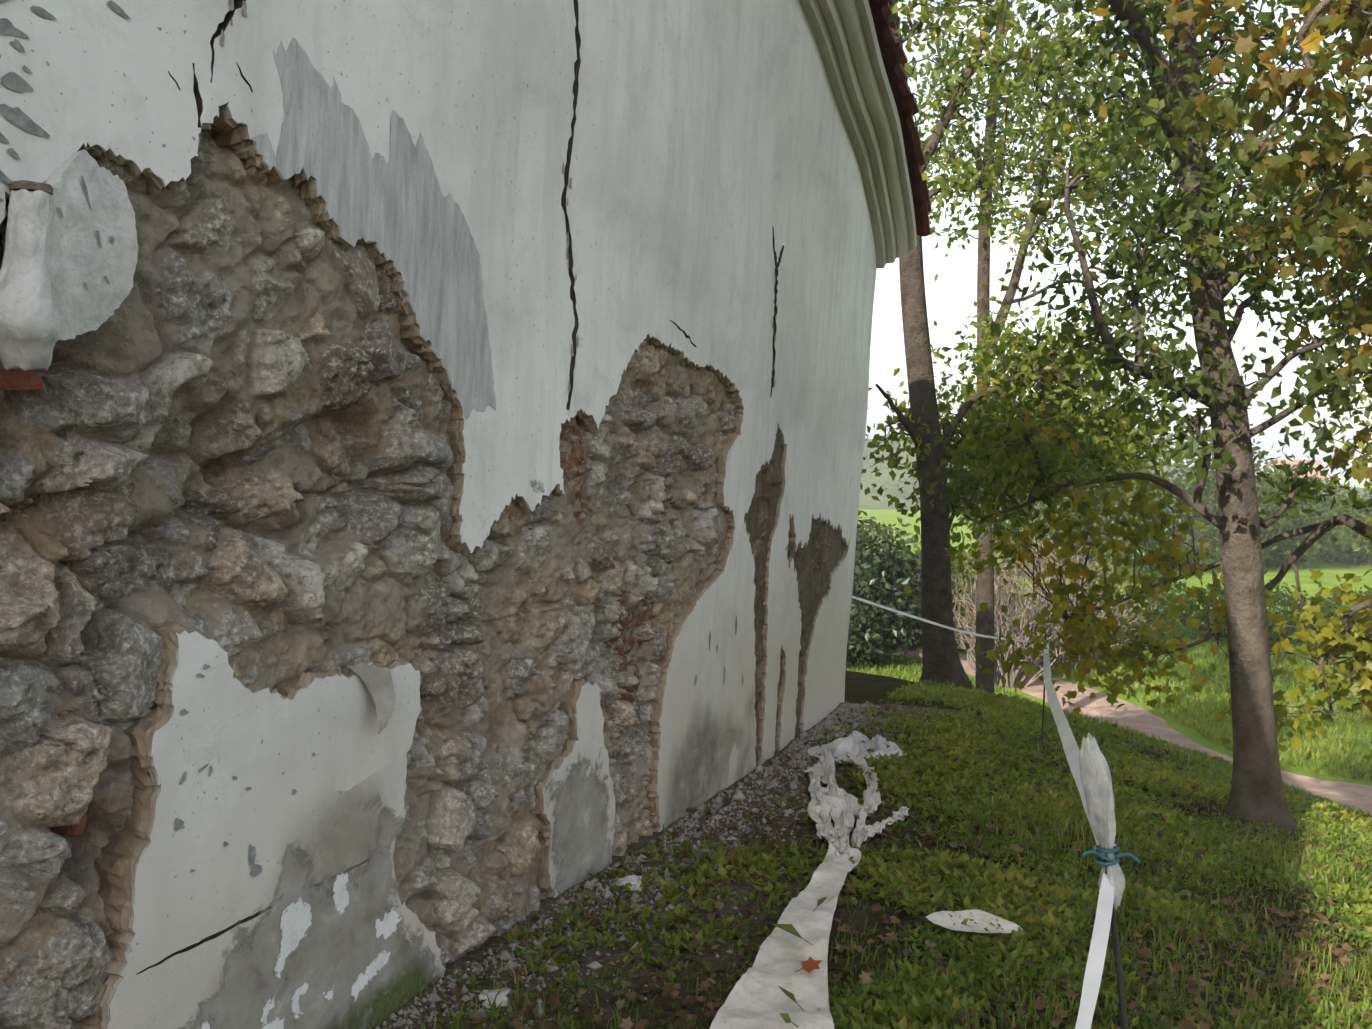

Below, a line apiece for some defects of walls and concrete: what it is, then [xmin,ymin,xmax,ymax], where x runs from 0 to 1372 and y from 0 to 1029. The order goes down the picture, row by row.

peeling [0,0,50,160]
peeling [31,5,57,20]
peeling [108,0,131,20]
crack [168,0,253,128]
crack [561,0,581,410]
flaking render [0,37,850,1029]
crack [314,858,369,888]
crack [136,904,277,975]